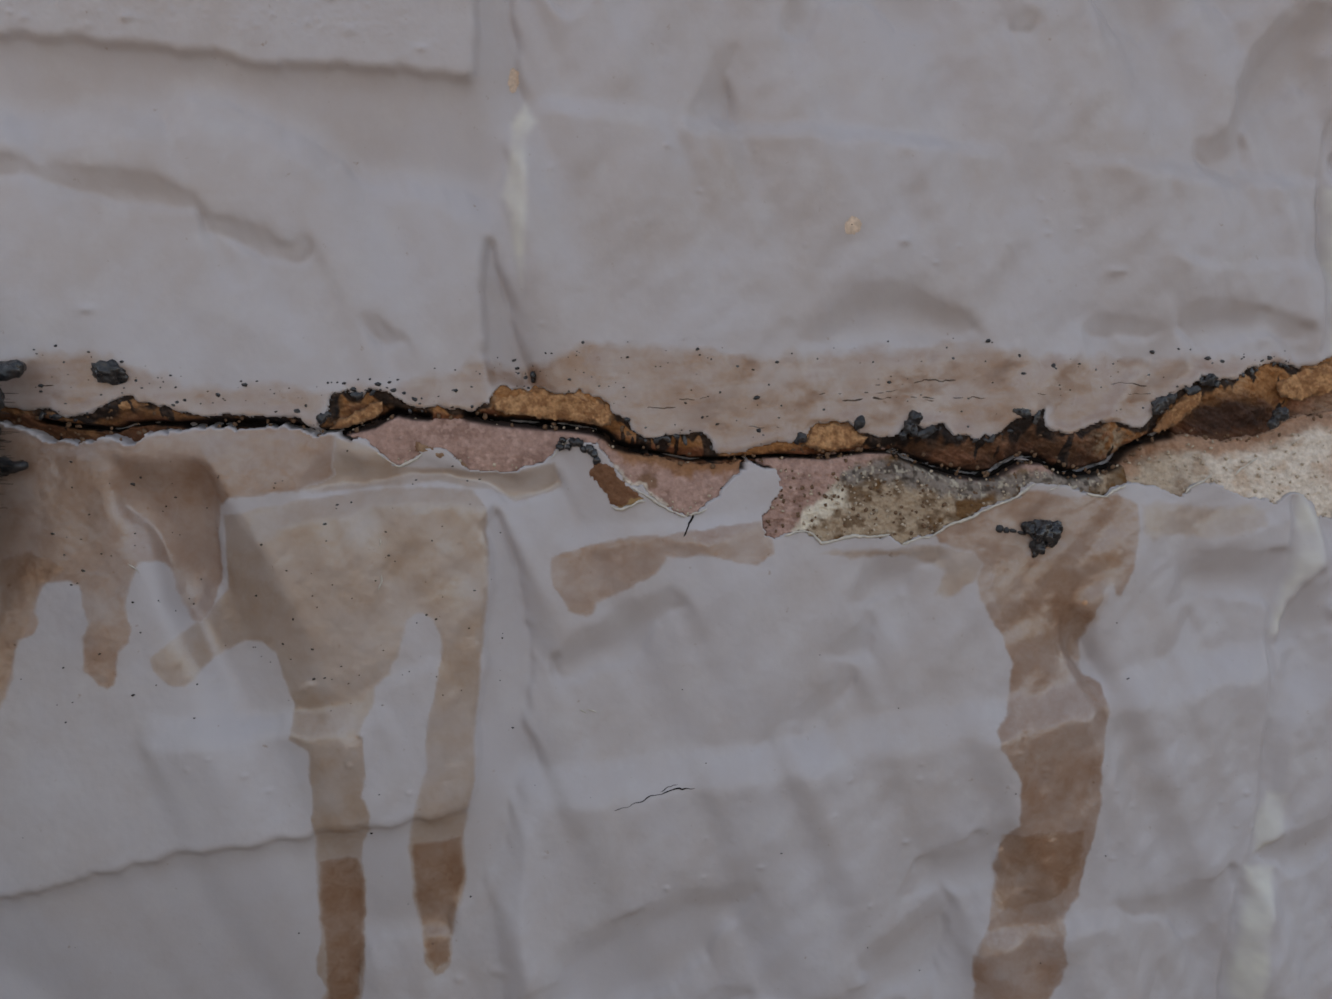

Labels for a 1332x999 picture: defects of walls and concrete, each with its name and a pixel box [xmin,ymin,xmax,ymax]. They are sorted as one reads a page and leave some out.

crack [0,357,1332,489]
peeling [346,410,1332,545]